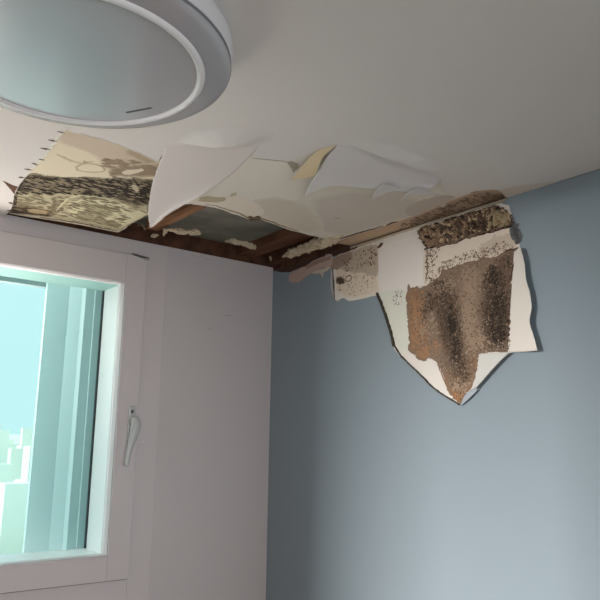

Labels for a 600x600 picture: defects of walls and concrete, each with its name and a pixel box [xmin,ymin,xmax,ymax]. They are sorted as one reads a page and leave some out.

water stain [9,130,159,230]
flaking render [190,195,298,231]
water stain [198,156,556,235]
water stain [305,244,379,296]
flaking render [332,269,383,301]
flaking render [350,227,433,288]
water stain [379,232,519,404]
flaking render [394,347,457,402]